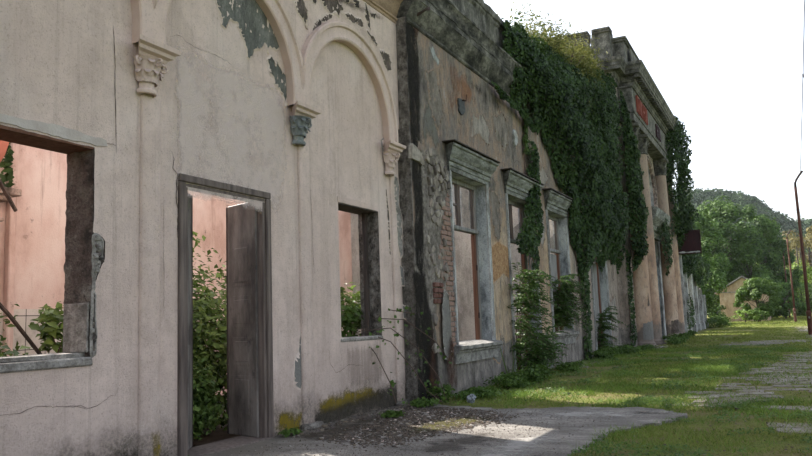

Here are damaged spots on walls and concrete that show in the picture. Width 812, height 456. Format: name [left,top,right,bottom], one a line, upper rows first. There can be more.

peeling [215,0,294,107]
peeling [294,0,392,72]
water stain [405,21,440,152]
water stain [276,160,495,452]
peeling [293,328,302,390]
crack [6,396,110,415]
water stain [481,434,553,456]